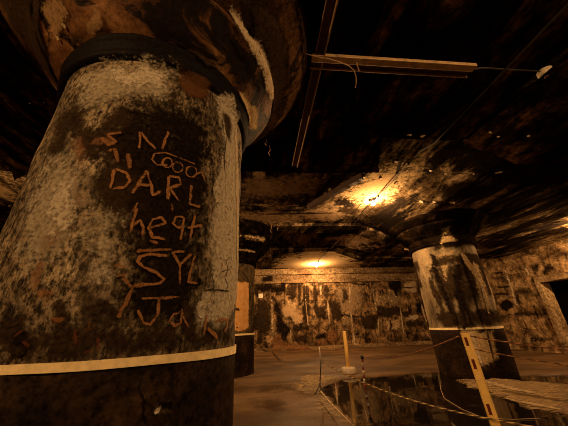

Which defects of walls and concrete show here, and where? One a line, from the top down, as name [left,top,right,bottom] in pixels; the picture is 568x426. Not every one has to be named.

leakage [0,56,240,364]
leakage [287,284,330,324]
leakage [429,251,546,365]